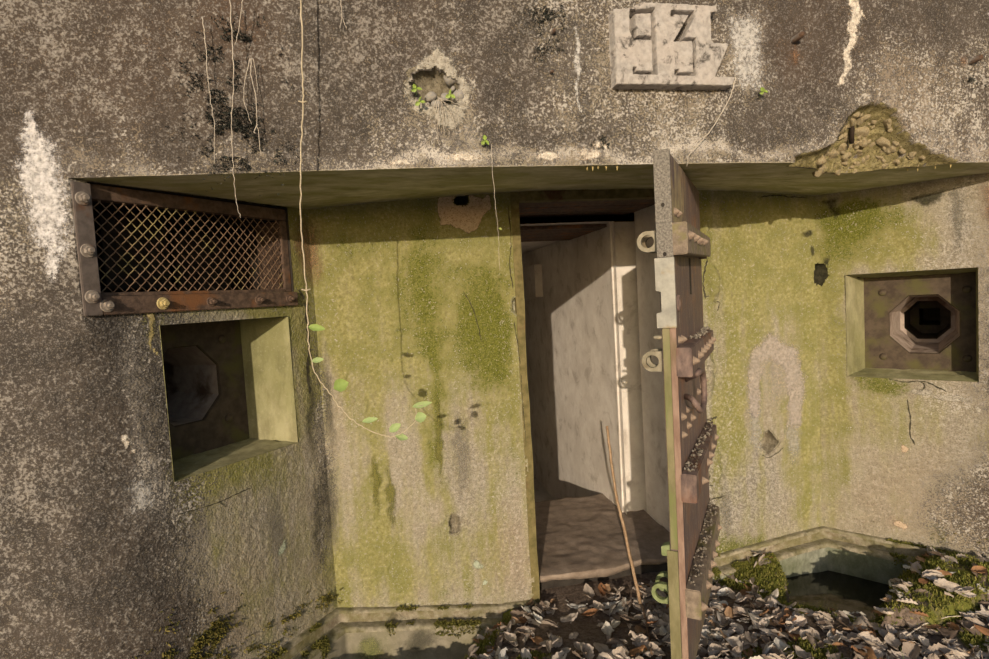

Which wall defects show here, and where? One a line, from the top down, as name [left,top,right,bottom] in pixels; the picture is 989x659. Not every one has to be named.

water stain [837,0,867,85]
spalling [403,47,474,130]
spalling [788,102,958,177]
water stain [15,112,72,279]
peeling [437,195,492,234]
water stain [435,400,444,469]
crack [889,379,947,445]
water stain [372,462,395,523]